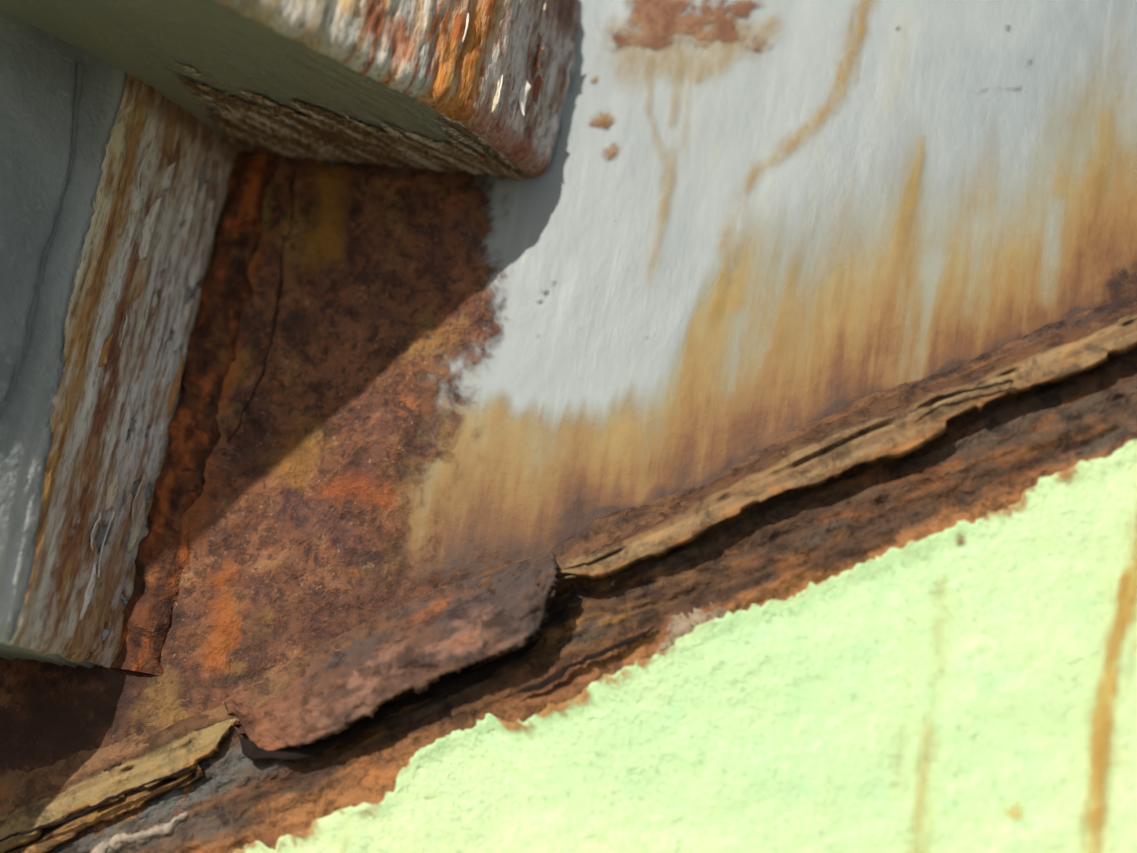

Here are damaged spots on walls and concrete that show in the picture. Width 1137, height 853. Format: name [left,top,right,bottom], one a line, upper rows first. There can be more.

rust [612,0,759,58]
rust [838,0,867,87]
rust [589,113,613,127]
crack [0,62,84,421]
peeling [10,0,580,668]
rust [0,144,1137,815]
rust [7,808,97,852]